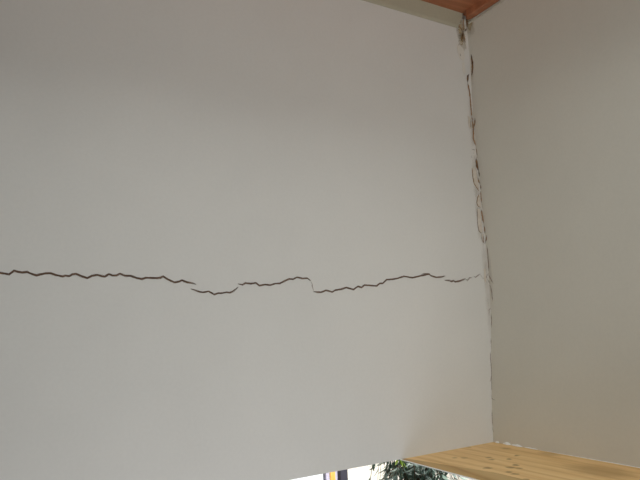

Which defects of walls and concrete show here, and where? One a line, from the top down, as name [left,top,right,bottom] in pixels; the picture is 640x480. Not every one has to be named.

crack [459,19,468,41]
crack [0,55,493,325]